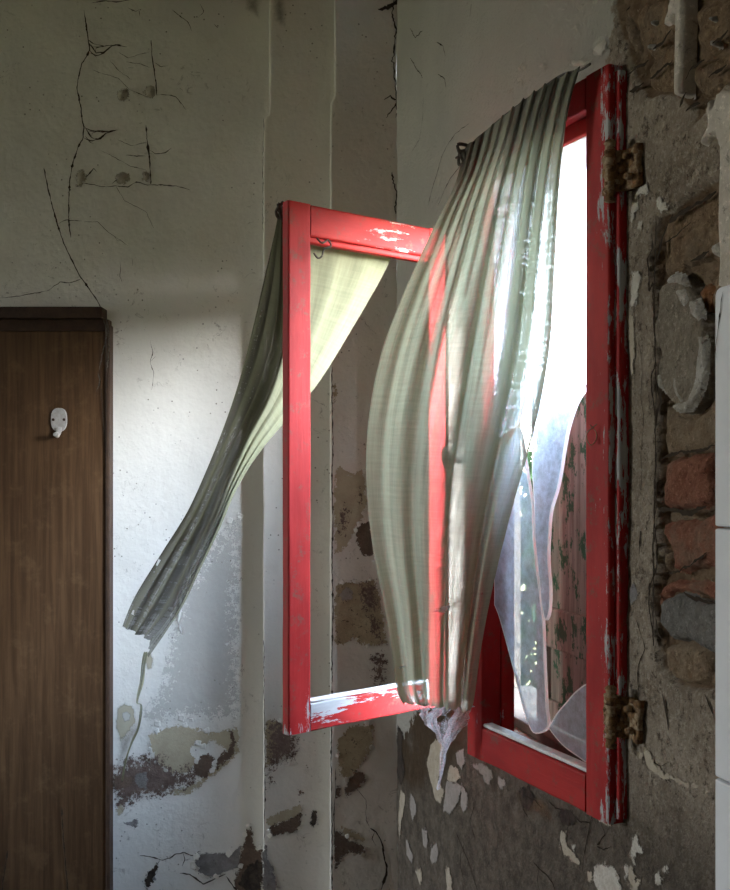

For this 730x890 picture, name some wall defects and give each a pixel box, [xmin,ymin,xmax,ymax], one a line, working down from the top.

spalling [626,0,730,111]
crack [6,0,189,307]
spalling [628,181,724,687]
peeling [333,466,374,556]
peeling [334,578,389,686]
peeling [113,715,240,828]
spalling [182,790,317,890]
spalling [397,725,422,884]
peeling [422,828,438,864]
peeling [427,738,506,815]
peeling [558,808,643,890]
peeling [639,750,714,797]